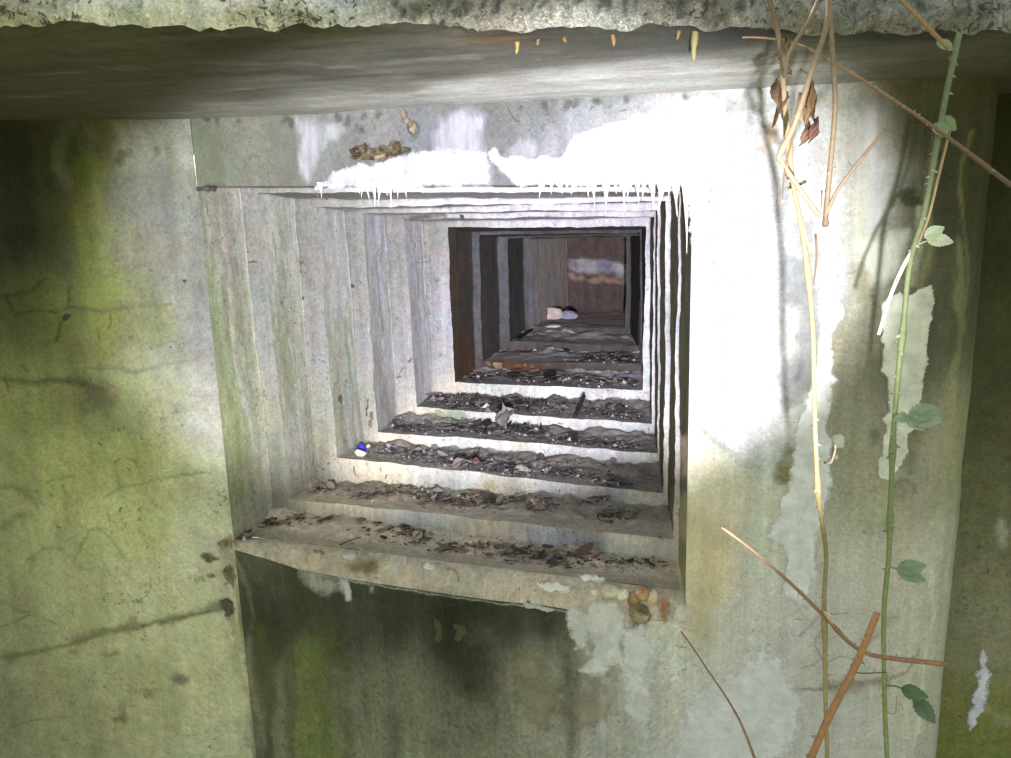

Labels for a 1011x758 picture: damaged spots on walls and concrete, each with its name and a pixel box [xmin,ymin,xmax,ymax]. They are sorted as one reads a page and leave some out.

leakage [286,98,727,288]
peeling [878,285,935,490]
leakage [305,573,367,601]
leakage [379,563,554,612]
leakage [567,602,656,736]
leakage [672,650,803,758]